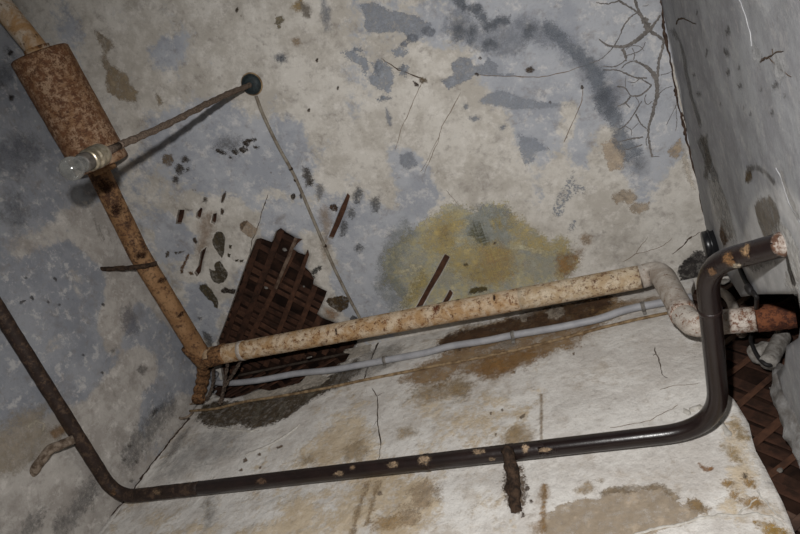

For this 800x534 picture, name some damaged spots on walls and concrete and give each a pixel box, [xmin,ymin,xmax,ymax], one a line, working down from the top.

crack [623,0,706,262]
spalling [193,193,243,308]
spalling [240,221,257,238]
water stain [382,201,579,309]
water stain [698,136,735,240]
water stain [755,197,780,236]
water stain [745,166,799,219]
spalling [326,296,358,320]
water stain [196,344,372,429]
crack [364,343,382,458]
crack [653,348,698,390]
water stain [539,481,712,534]